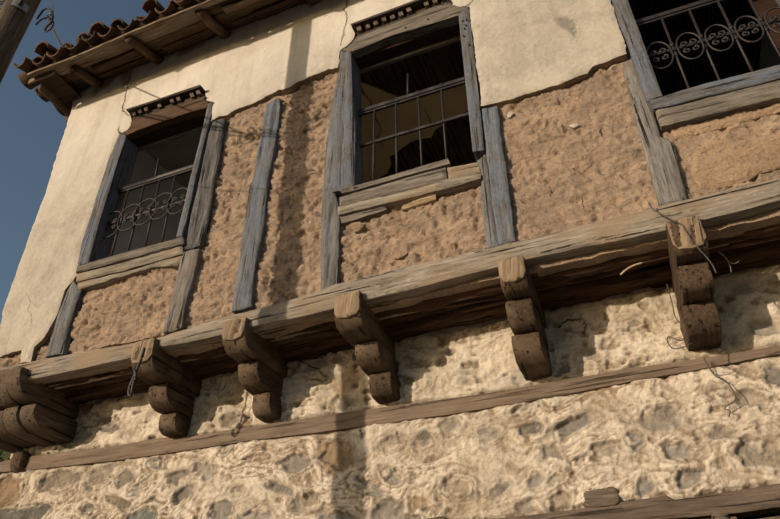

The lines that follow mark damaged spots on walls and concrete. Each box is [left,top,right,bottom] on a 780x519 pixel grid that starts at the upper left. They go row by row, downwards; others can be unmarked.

flaking render [498,56,659,242]
flaking render [658,103,780,200]
flaking render [185,72,338,329]
flaking render [339,186,487,283]
flaking render [67,268,178,355]